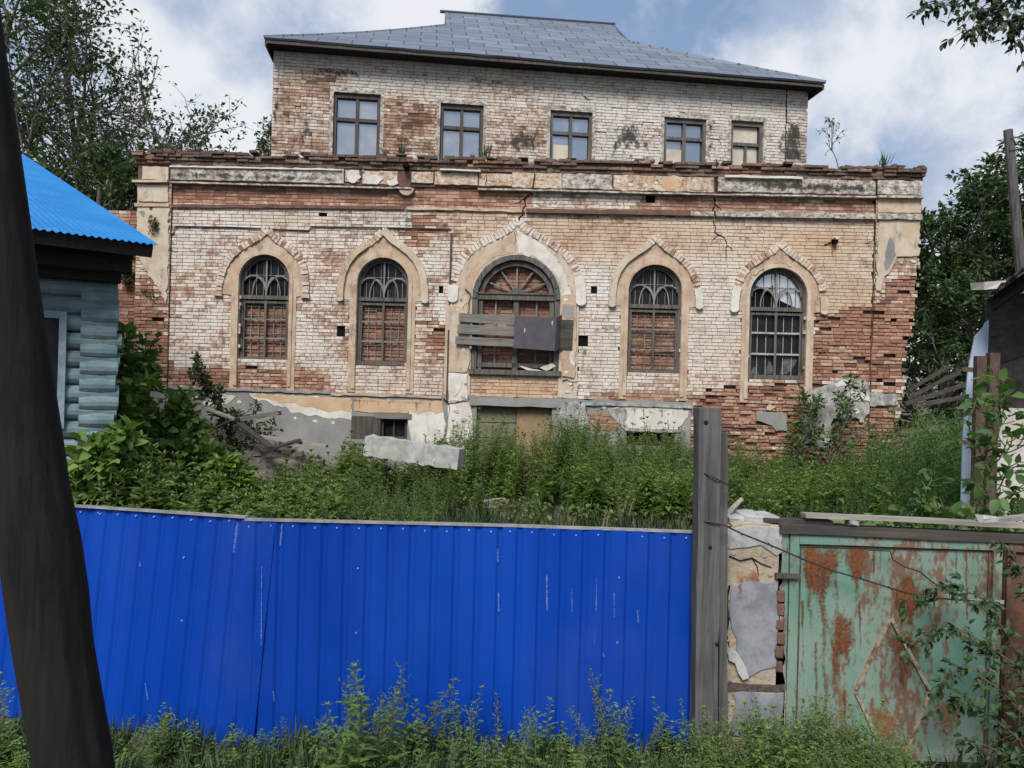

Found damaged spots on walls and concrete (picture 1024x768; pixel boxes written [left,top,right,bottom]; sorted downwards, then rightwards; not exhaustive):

flaking render [346,170,398,186]
crack [502,173,541,252]
water stain [501,131,543,155]
water stain [612,115,648,156]
crack [711,159,732,256]
water stain [779,123,804,160]
peeling [134,207,467,444]
spalling [587,219,920,491]
flaking render [728,525,783,558]
flaking render [727,573,785,682]
corrosion [801,544,894,732]
corrosion [891,576,930,683]